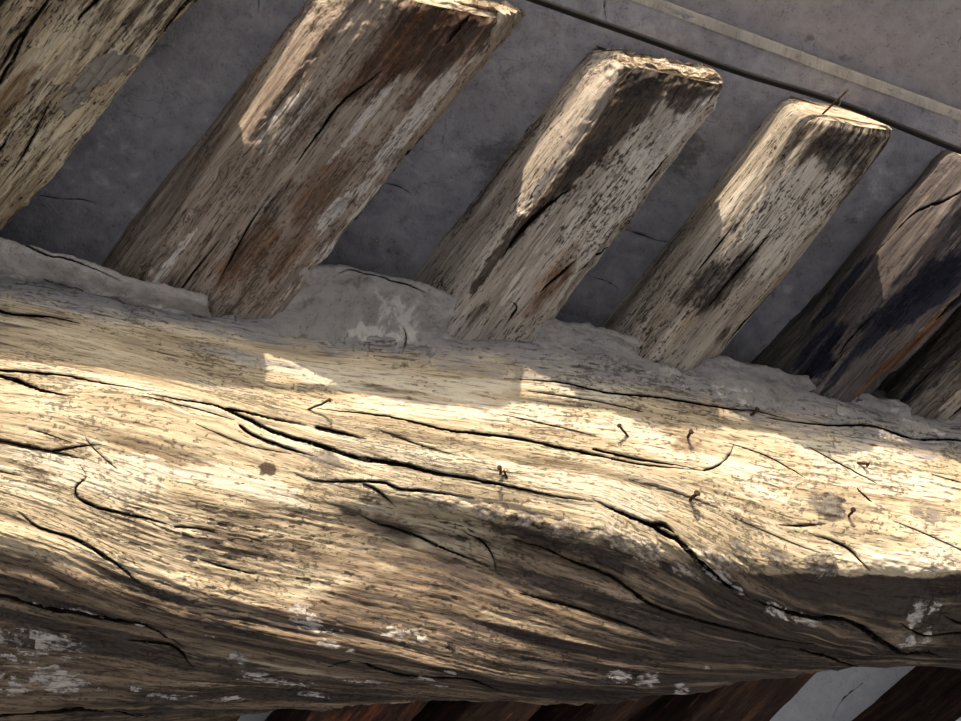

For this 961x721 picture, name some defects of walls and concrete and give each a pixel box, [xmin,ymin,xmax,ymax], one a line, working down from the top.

crack [0,369,961,667]
crack [328,660,500,691]
crack [511,539,863,718]